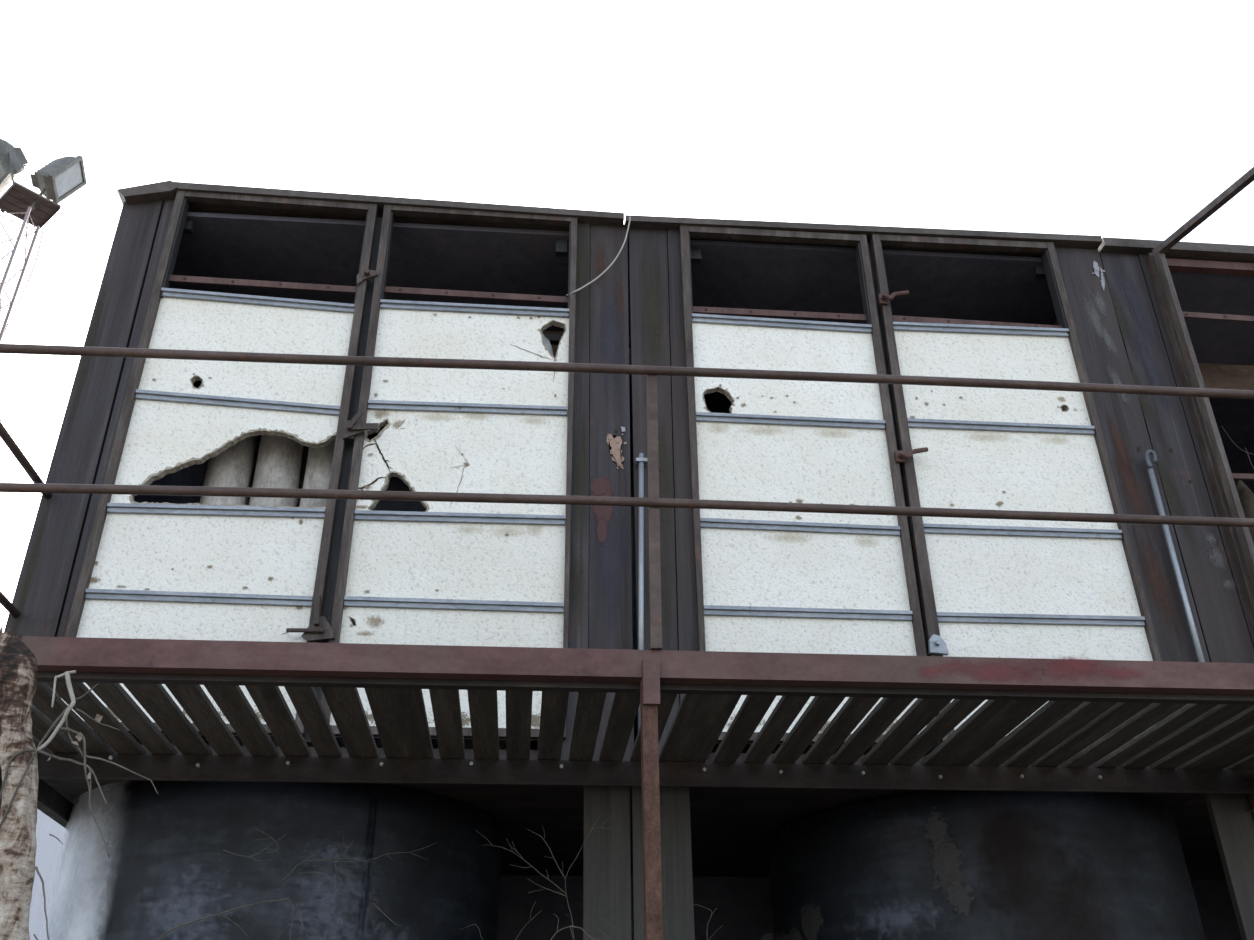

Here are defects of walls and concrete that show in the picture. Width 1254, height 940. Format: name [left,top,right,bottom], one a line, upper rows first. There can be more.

peeling [606,427,627,469]